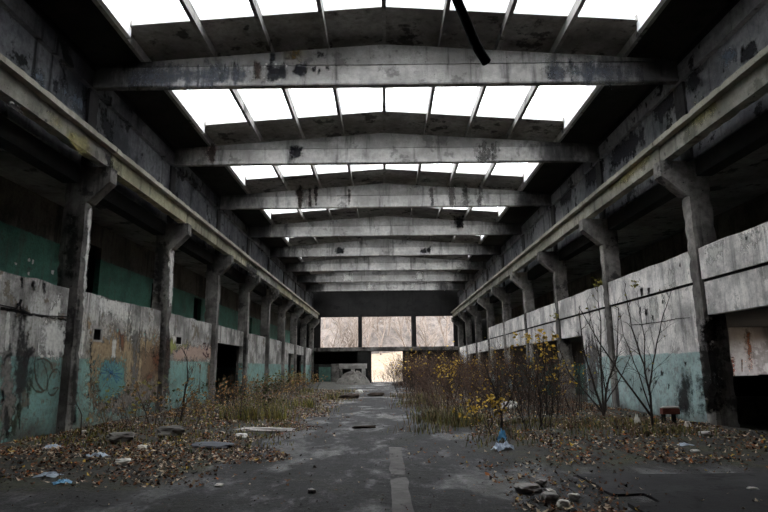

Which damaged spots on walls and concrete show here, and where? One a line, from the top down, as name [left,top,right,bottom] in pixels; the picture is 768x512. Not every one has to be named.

damp [122,60,329,91]
damp [4,295,80,429]
peeling [82,318,160,424]
damp [675,317,727,418]
rust [741,329,752,372]